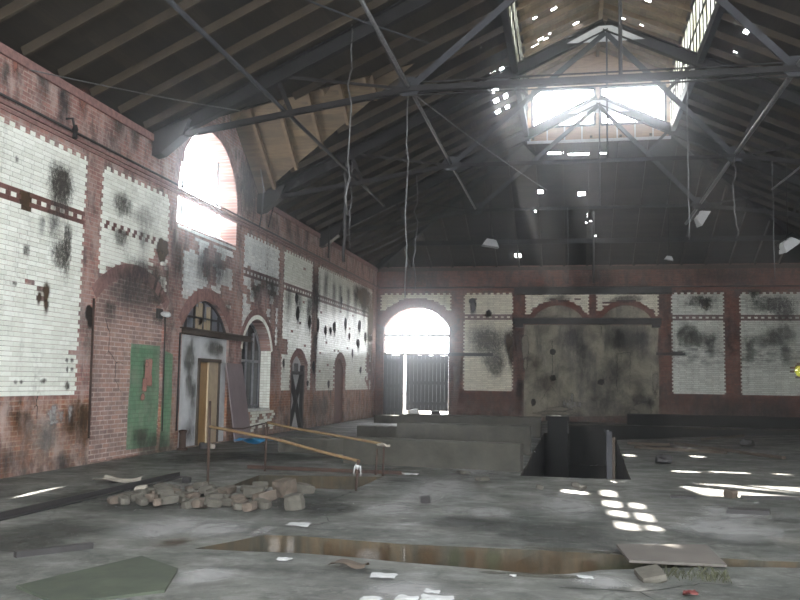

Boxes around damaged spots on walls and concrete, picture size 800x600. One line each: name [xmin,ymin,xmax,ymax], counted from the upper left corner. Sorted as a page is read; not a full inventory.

spalling [37,283,50,312]
leakage [504,331,514,366]
leakage [678,324,717,350]
leakage [747,326,792,360]
peeling [141,359,153,400]
leakage [185,346,196,402]